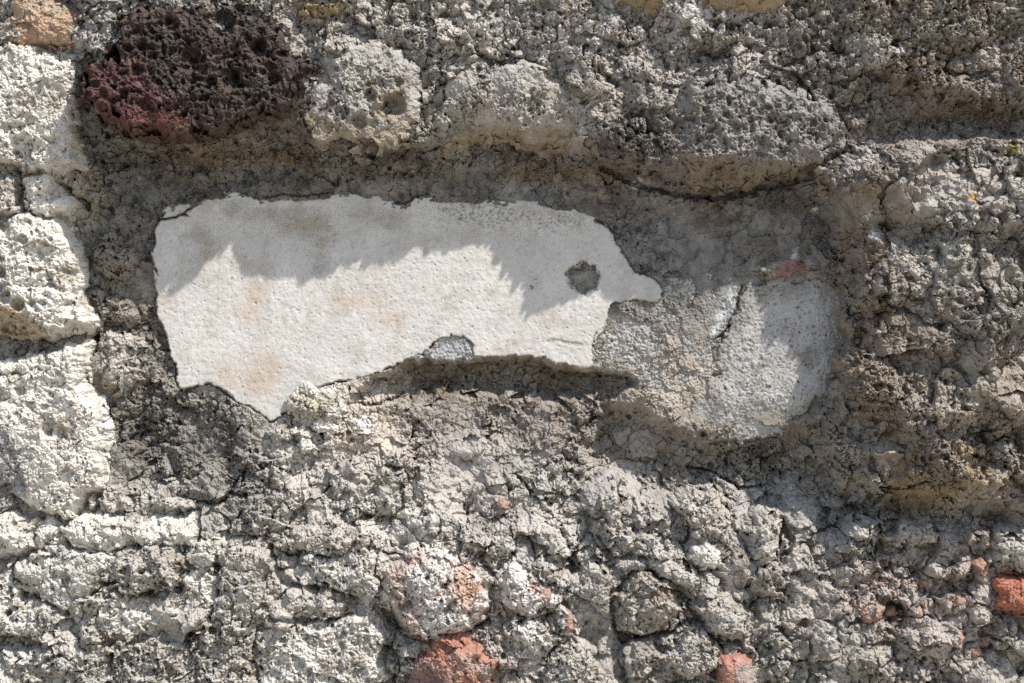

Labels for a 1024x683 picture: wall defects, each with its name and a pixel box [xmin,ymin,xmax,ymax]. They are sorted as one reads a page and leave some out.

crack [709,288,741,340]
spalling [414,335,484,366]
crack [354,396,400,406]
crack [194,461,291,505]